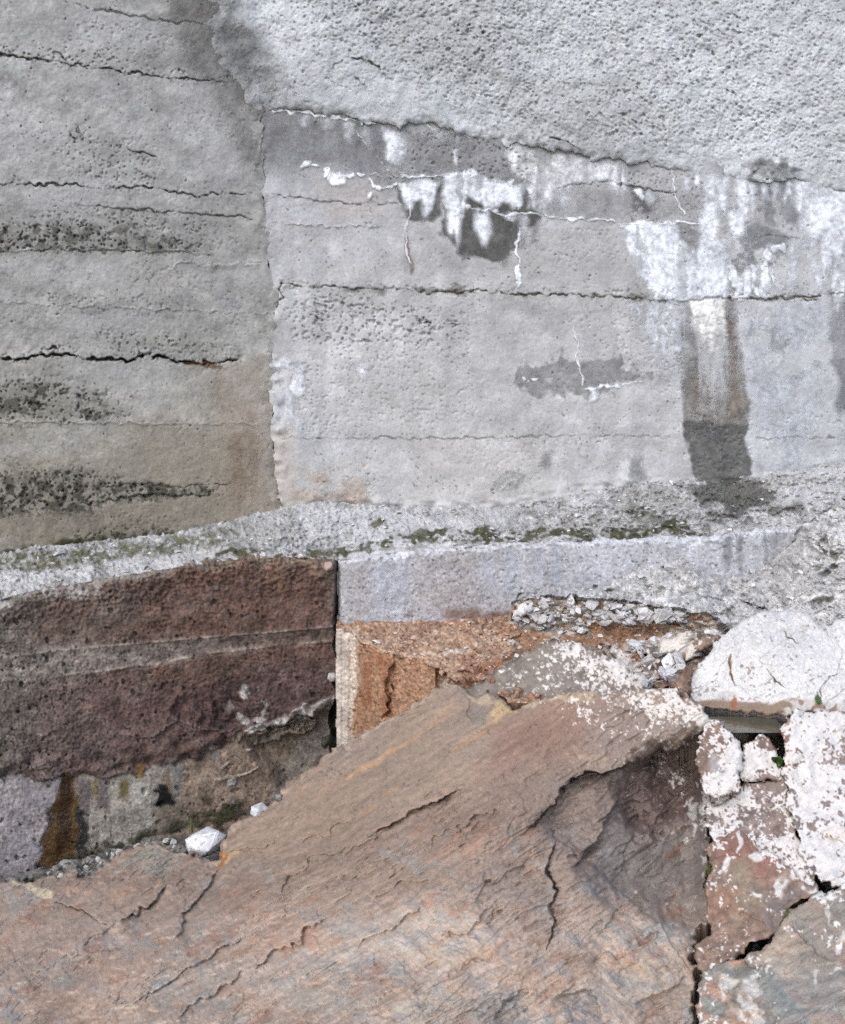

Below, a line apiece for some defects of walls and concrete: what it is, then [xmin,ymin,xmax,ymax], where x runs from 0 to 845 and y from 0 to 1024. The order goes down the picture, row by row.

crack [0,51,213,81]
crack [5,182,252,220]
damp [175,0,845,530]
crack [420,228,845,304]
crack [2,345,236,365]